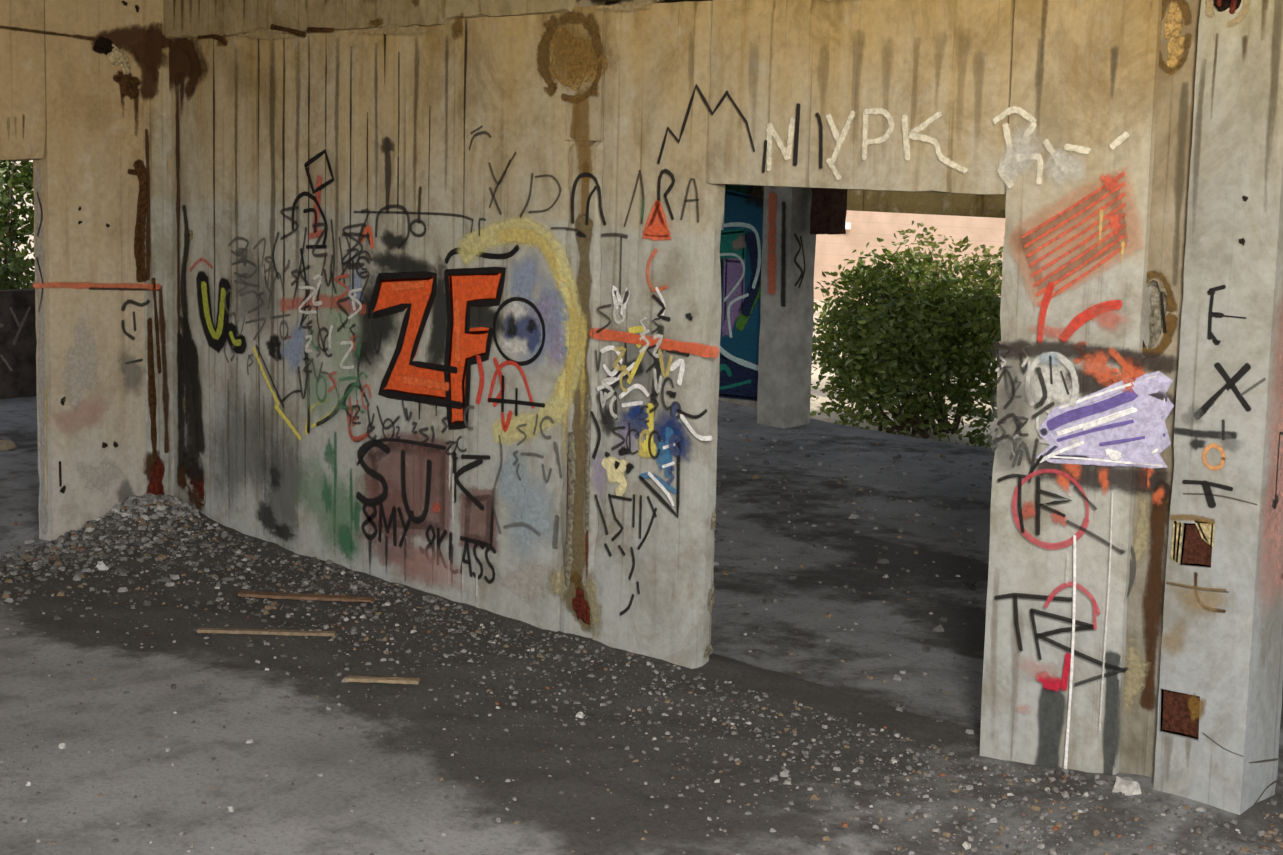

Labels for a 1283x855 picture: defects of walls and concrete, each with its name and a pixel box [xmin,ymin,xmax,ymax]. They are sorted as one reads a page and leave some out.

rust [571,93,592,216]
rust [1175,91,1185,262]
rust [119,451,206,510]
rust [1122,485,1226,739]